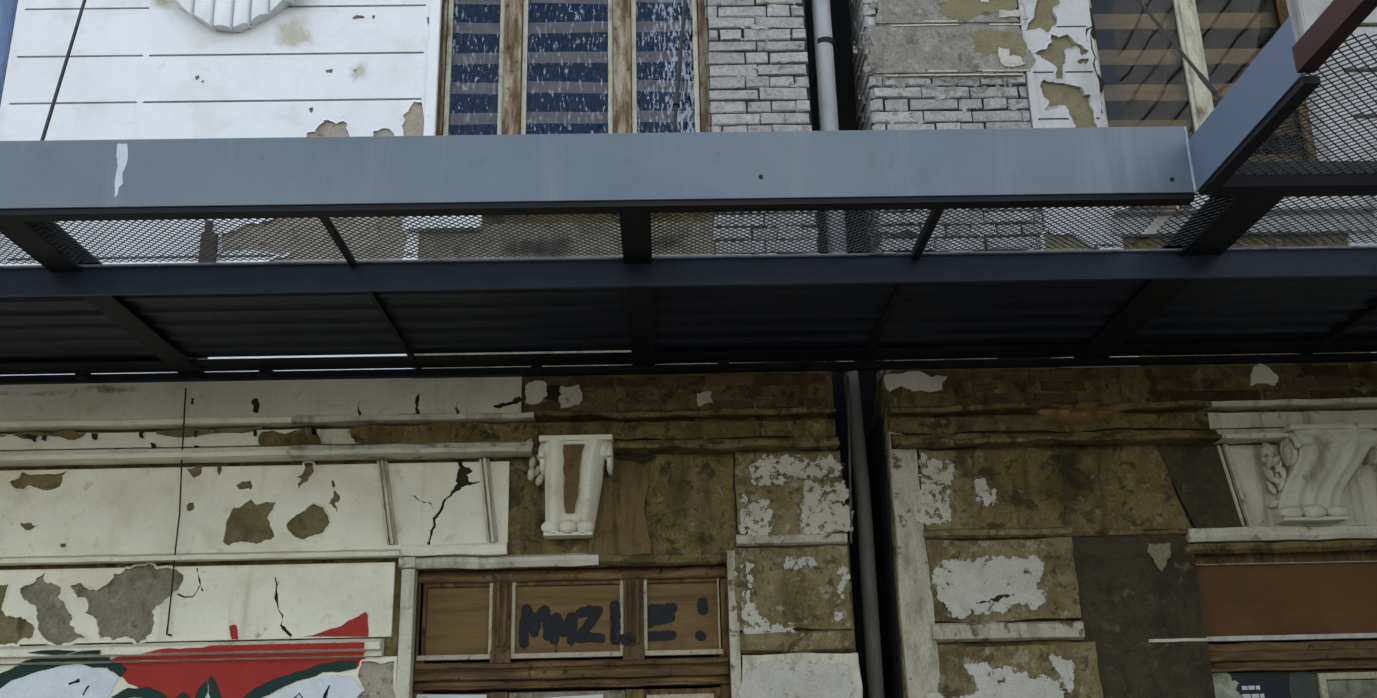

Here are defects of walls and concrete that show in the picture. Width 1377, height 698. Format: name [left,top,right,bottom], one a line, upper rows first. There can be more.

peeling [938,0,1106,128]
peeling [1040,207,1124,250]
peeling [1060,356,1139,368]
peeling [0,430,98,442]
spalling [8,469,68,493]
spalling [139,398,340,548]
crack [413,459,480,545]
peeling [798,480,854,534]
peeling [0,562,186,647]
crack [275,578,292,640]